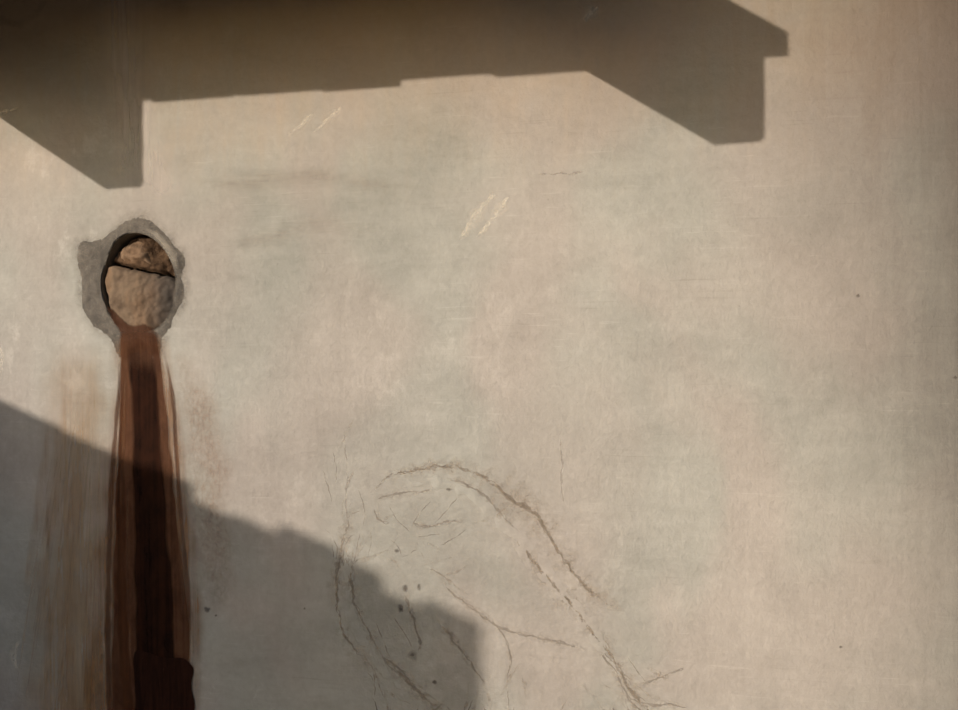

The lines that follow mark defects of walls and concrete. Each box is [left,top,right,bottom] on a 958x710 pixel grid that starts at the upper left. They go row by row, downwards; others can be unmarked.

corrosion [86,308,200,710]
crack [334,516,442,710]
crack [374,462,685,710]